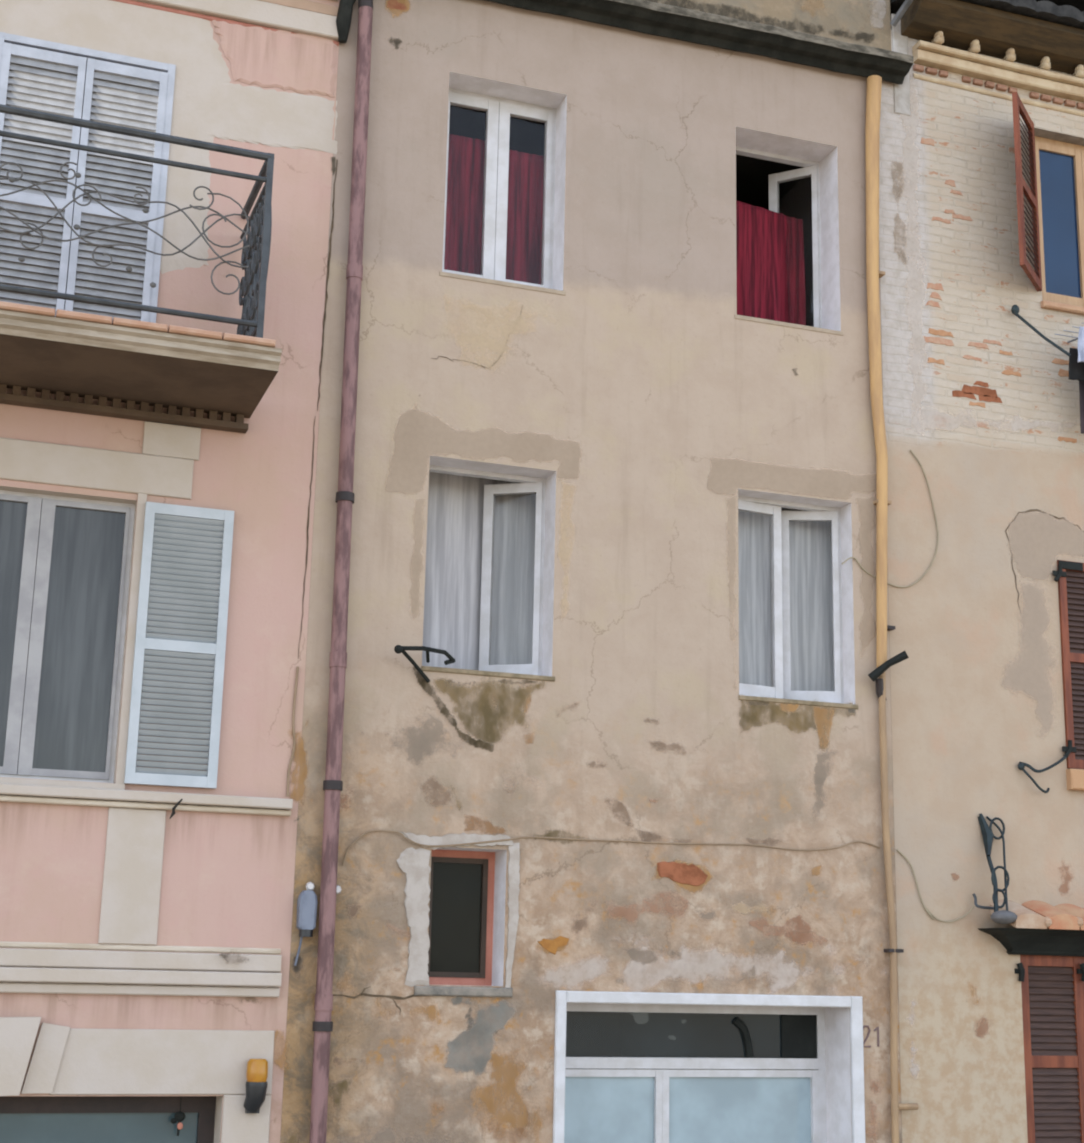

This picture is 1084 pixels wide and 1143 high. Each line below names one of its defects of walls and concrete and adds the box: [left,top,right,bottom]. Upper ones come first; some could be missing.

leakage [646,0,874,43]
peeling [212,20,337,97]
crack [431,305,523,369]
flaking render [923,328,1013,361]
flaking render [952,381,1002,408]
peeling [1002,584,1056,735]
leakage [394,667,545,764]
leakage [739,700,855,811]
flaking render [655,860,712,892]
flaking render [537,936,569,955]
peeling [544,903,831,992]